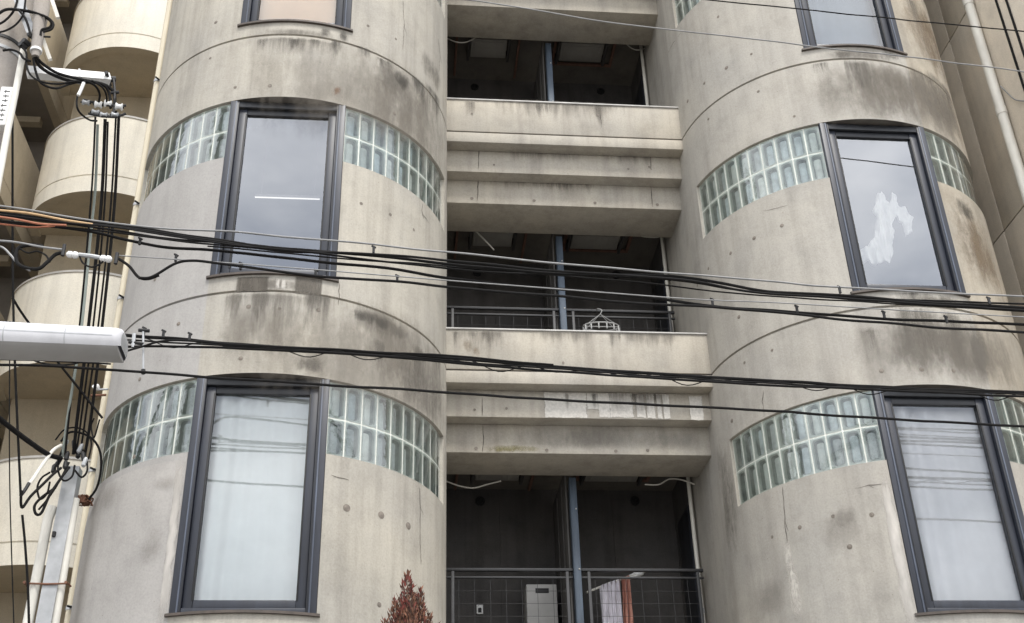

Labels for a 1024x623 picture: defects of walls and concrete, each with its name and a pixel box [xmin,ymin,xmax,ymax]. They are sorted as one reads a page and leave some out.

damp [387,74,437,104]
damp [232,277,322,305]
peeling [544,392,671,419]
peeling [689,396,704,420]